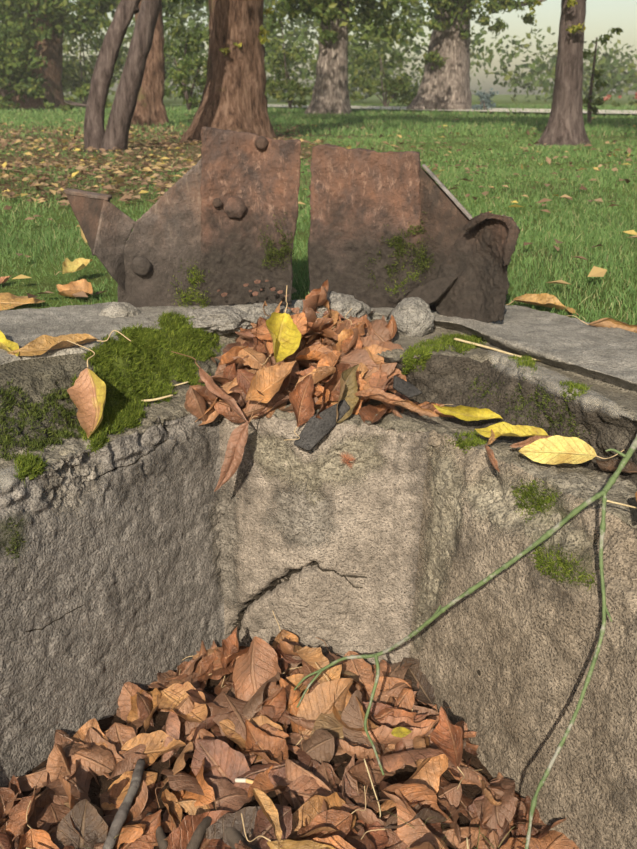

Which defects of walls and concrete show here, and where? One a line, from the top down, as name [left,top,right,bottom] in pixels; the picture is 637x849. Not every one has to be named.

crack [84,416,169,482]
crack [231,561,367,639]